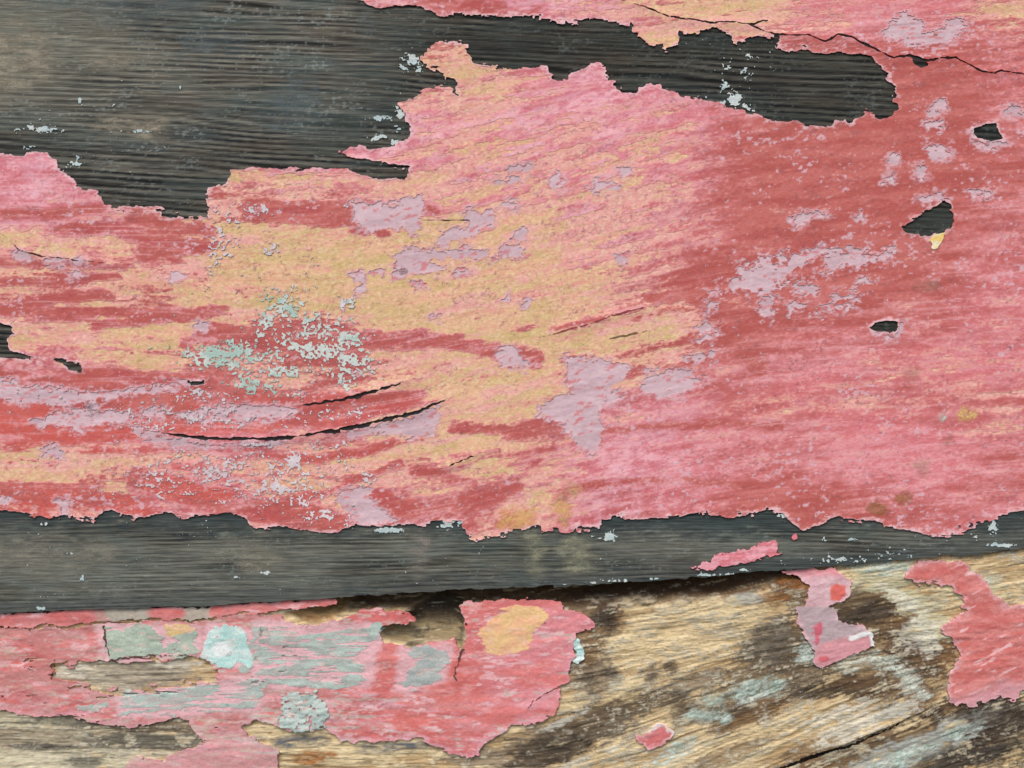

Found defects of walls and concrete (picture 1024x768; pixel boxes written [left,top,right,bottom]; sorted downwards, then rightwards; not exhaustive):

crack [622,0,1024,75]
peeling [915,98,951,181]
peeling [971,104,1024,151]
peeling [880,152,904,187]
peeling [243,202,269,220]
peeling [902,192,954,249]
peeling [0,224,138,278]
peeling [0,286,47,302]
peeling [869,321,904,340]
crack [163,382,454,441]
peeling [302,509,337,526]
peeling [635,723,674,750]